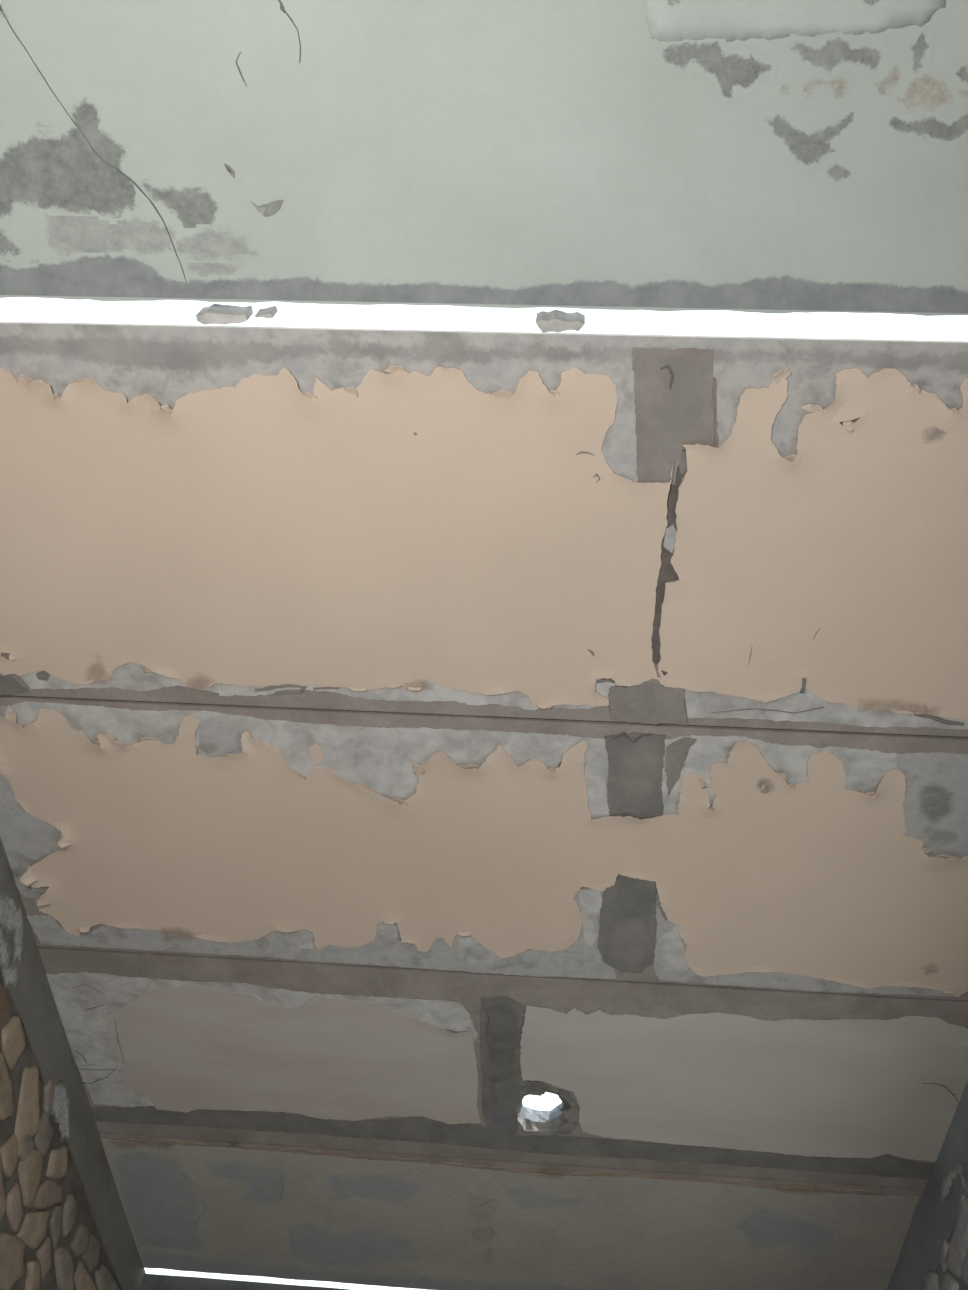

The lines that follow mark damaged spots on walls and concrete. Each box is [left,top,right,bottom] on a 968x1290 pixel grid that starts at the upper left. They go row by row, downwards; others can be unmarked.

crack [0,0,187,285]
crack [278,0,301,63]
water stain [0,97,968,313]
peeling [657,28,936,102]
peeling [759,107,859,185]
peeling [882,106,968,146]
peeling [0,366,250,414]
peeling [576,347,836,485]
crack [651,449,687,681]
peeling [0,653,968,859]
peeling [0,770,957,997]
peeling [46,972,580,1138]